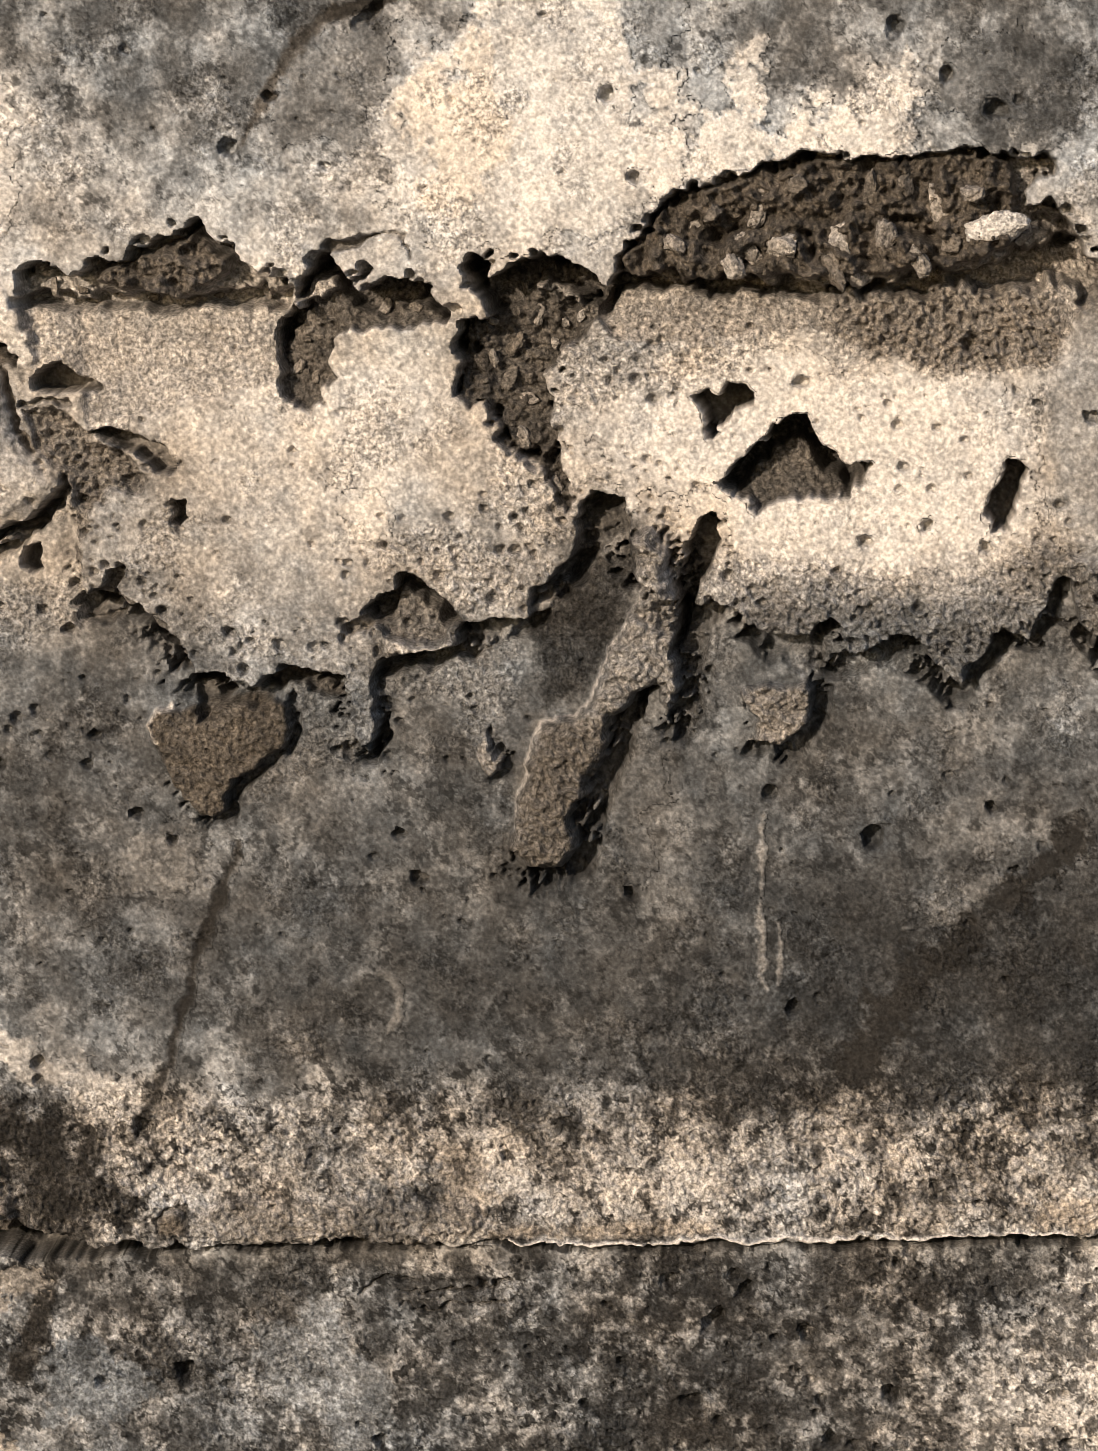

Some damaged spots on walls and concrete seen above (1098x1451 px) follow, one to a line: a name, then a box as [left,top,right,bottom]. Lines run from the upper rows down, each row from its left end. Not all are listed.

spalling [0,144,1098,582]
peeling [145,661,349,817]
crack [0,1224,1098,1315]